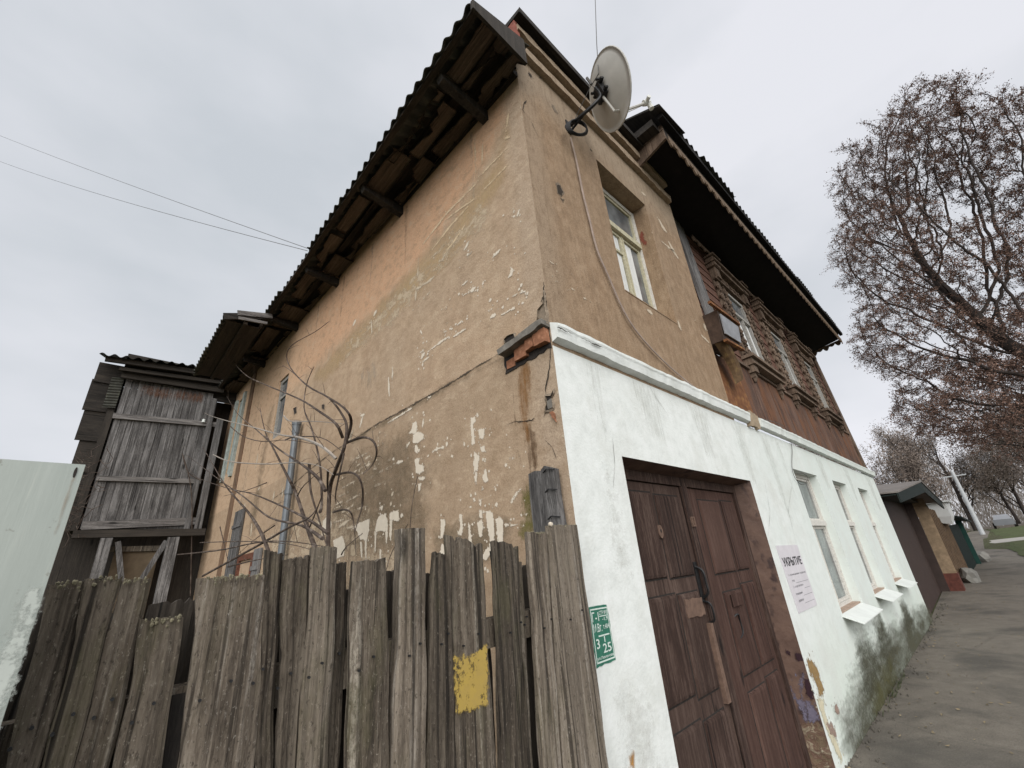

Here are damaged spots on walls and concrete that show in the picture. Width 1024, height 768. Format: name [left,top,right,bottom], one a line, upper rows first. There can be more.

peeling [340,106,528,370]
spalling [497,290,552,374]
crack [505,282,602,457]
peeling [260,396,453,589]
peeling [430,409,527,573]
spalling [785,650,844,768]
mould [846,604,933,754]